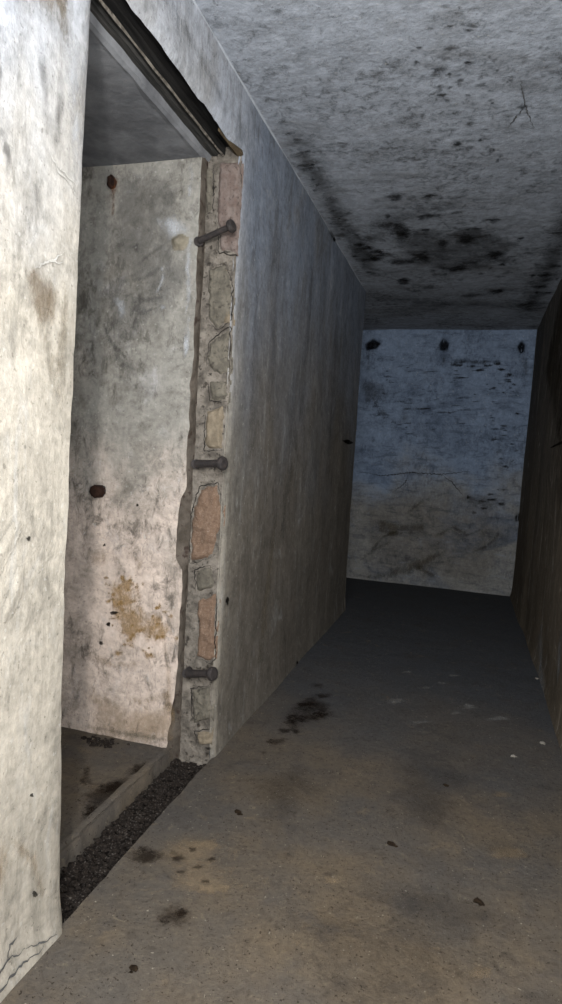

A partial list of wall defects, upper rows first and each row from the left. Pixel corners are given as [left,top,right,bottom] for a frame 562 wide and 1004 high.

water stain [353,234,429,264]
crack [0,934,57,993]